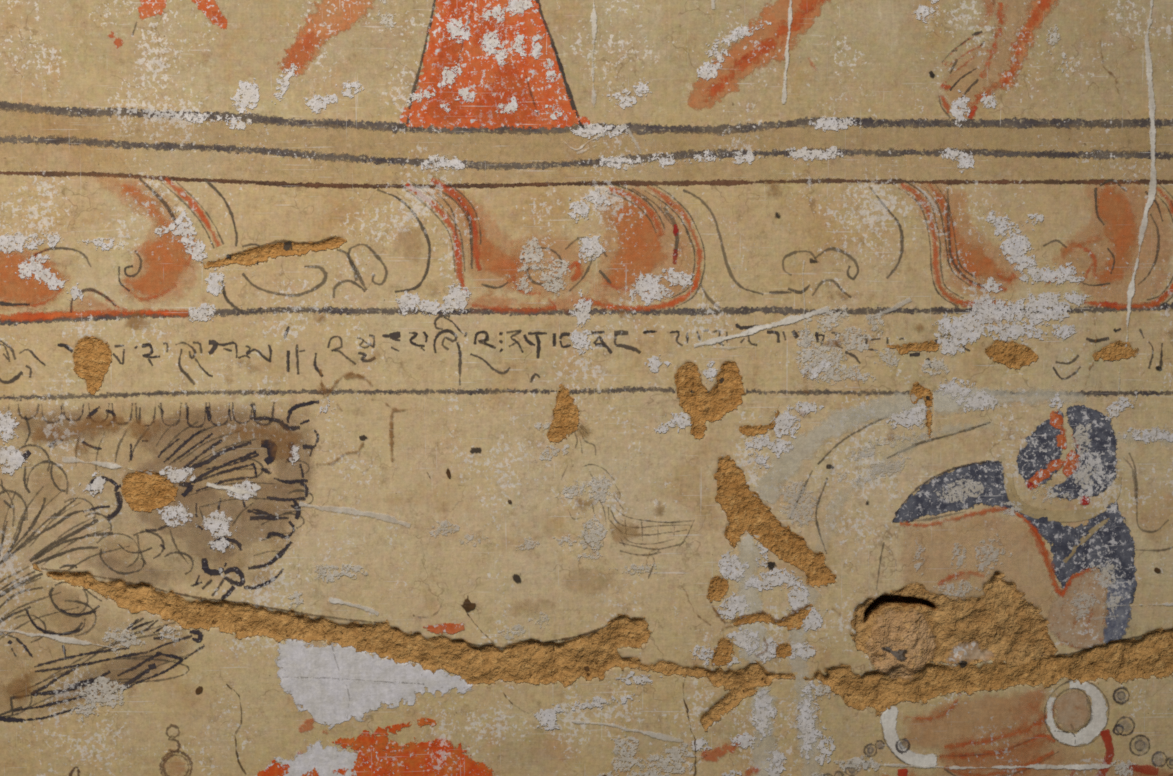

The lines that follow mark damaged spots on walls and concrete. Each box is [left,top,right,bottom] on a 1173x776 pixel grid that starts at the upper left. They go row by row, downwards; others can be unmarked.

spalling [154,209,347,322]
spalling [73,336,112,395]
spalling [534,384,579,460]
spalling [644,354,746,439]
spalling [796,204,1091,484]
peeling [1002,391,1138,516]
spalling [1092,340,1138,361]
spalling [690,401,837,667]
spalling [462,595,476,612]
spalling [850,535,1058,670]
peeling [70,676,129,721]
peeling [264,639,474,776]